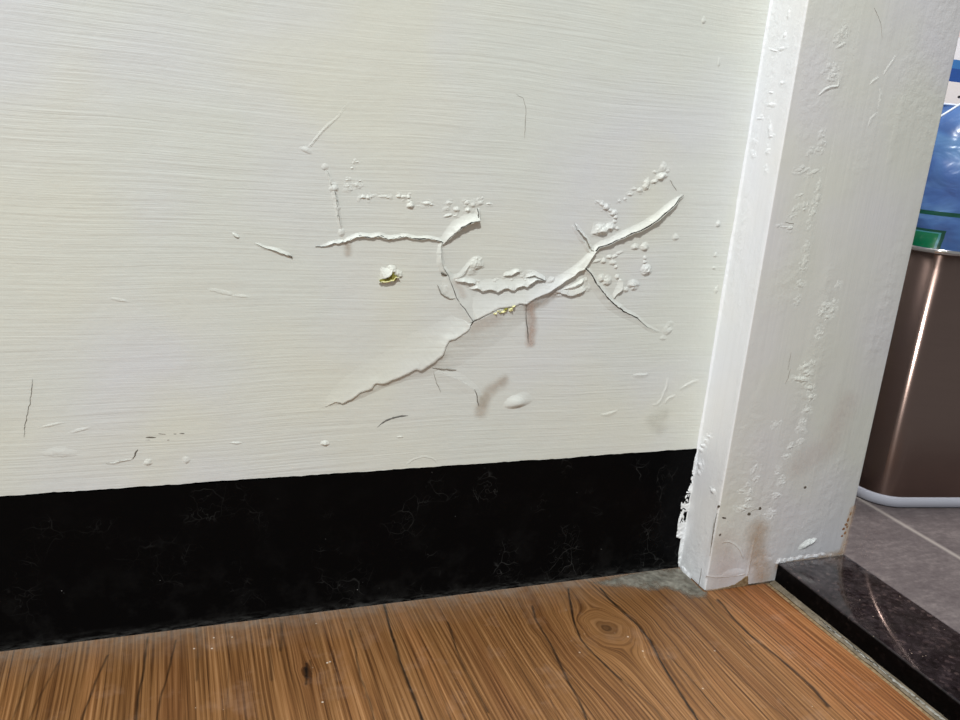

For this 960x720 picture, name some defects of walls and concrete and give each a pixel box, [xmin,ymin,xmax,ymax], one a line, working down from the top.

crack [299,99,684,410]
peeling [676,452,698,564]